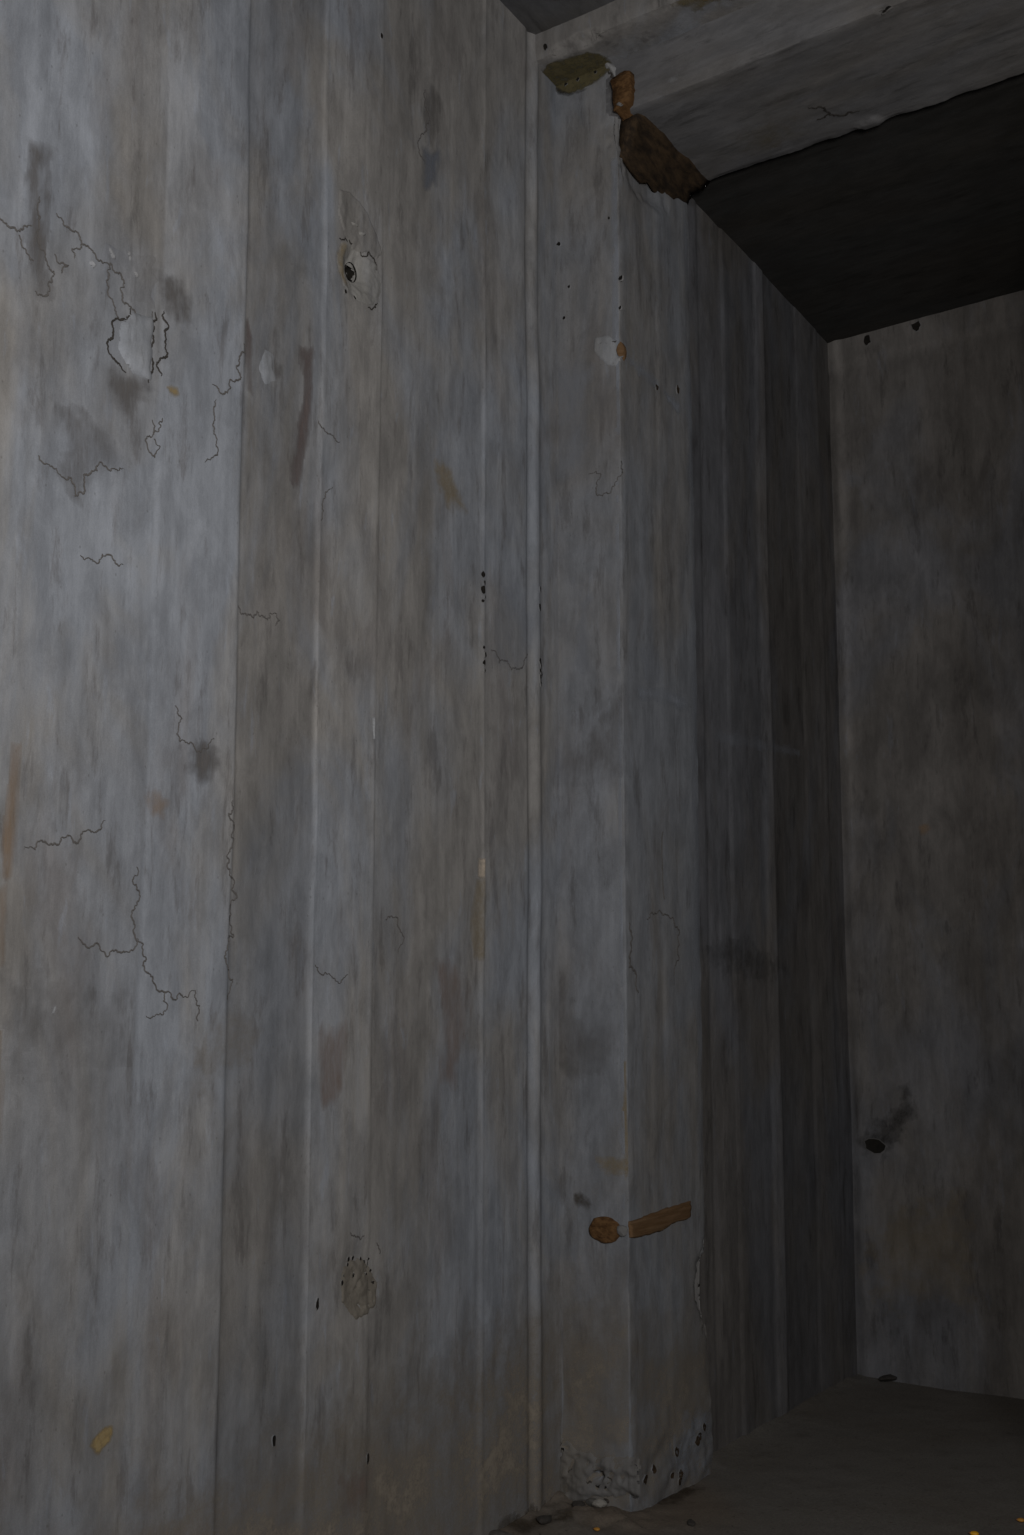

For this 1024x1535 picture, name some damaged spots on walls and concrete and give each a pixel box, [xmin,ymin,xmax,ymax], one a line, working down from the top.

crack [0,196,153,318]
crack [24,820,105,850]
crack [78,800,238,1021]
spalling [642,1423,706,1486]